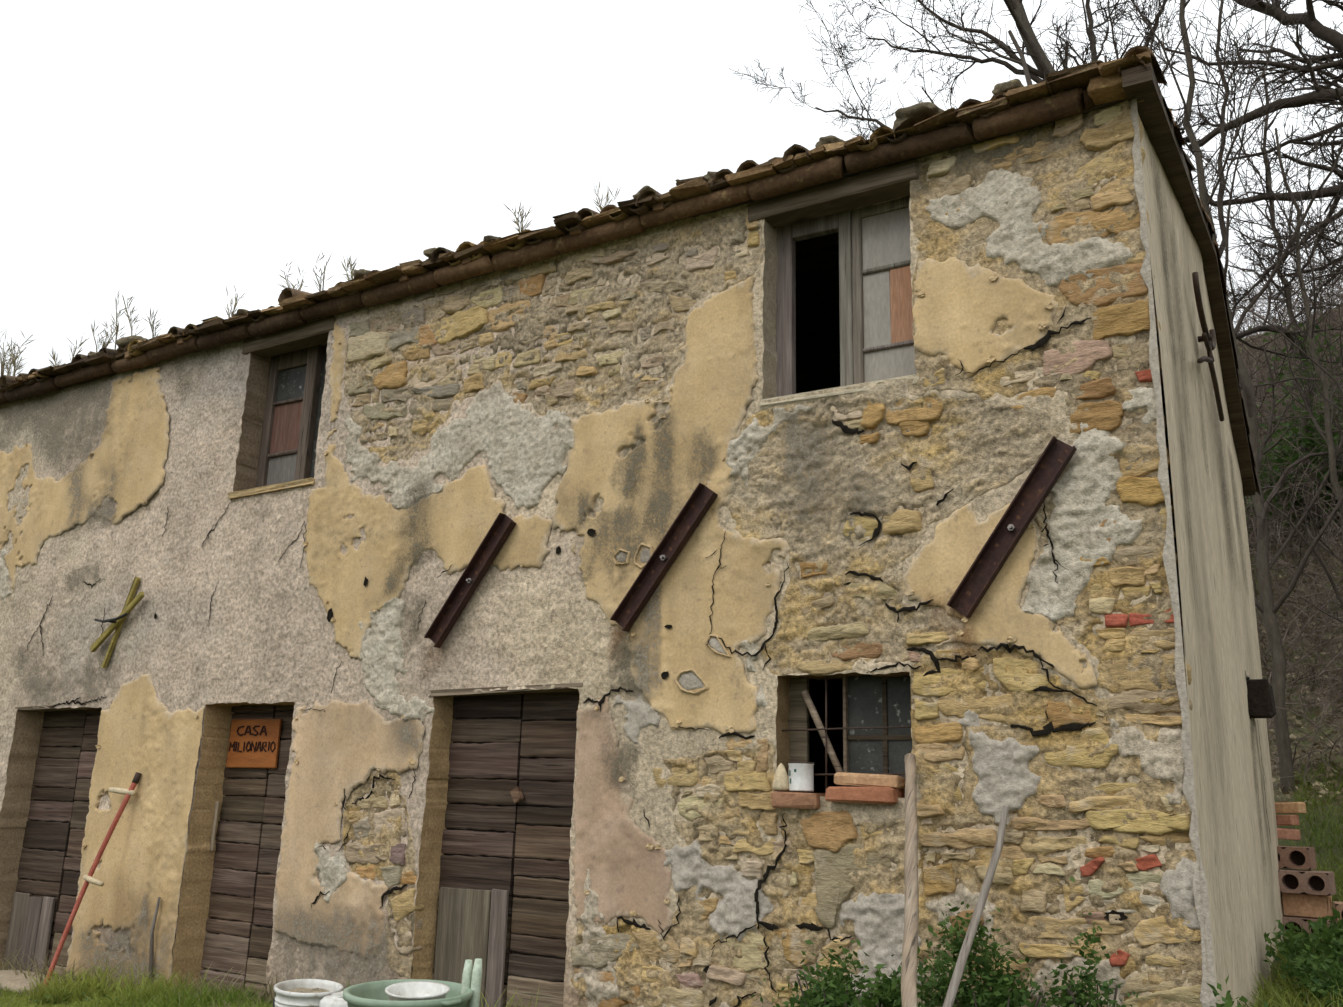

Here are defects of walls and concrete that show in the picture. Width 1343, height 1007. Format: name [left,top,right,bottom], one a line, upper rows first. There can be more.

leakage [578,413,674,575]
crack [706,531,789,669]
spalling [303,101,1203,1007]
peeling [274,700,425,979]
crack [616,895,681,941]
crack [705,813,852,1007]